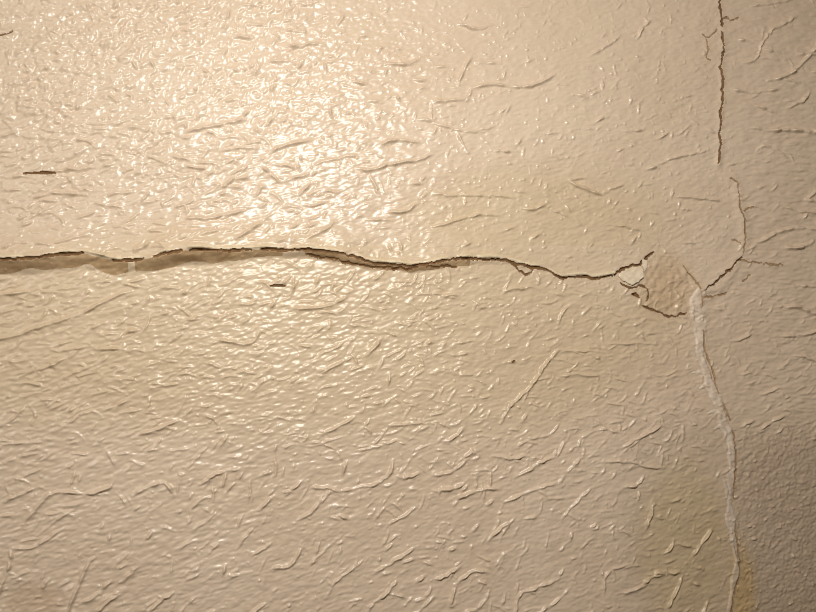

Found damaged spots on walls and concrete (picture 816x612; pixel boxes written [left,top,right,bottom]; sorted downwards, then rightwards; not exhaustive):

crack [683,0,783,298]
crack [0,244,687,318]
peeling [618,259,648,285]